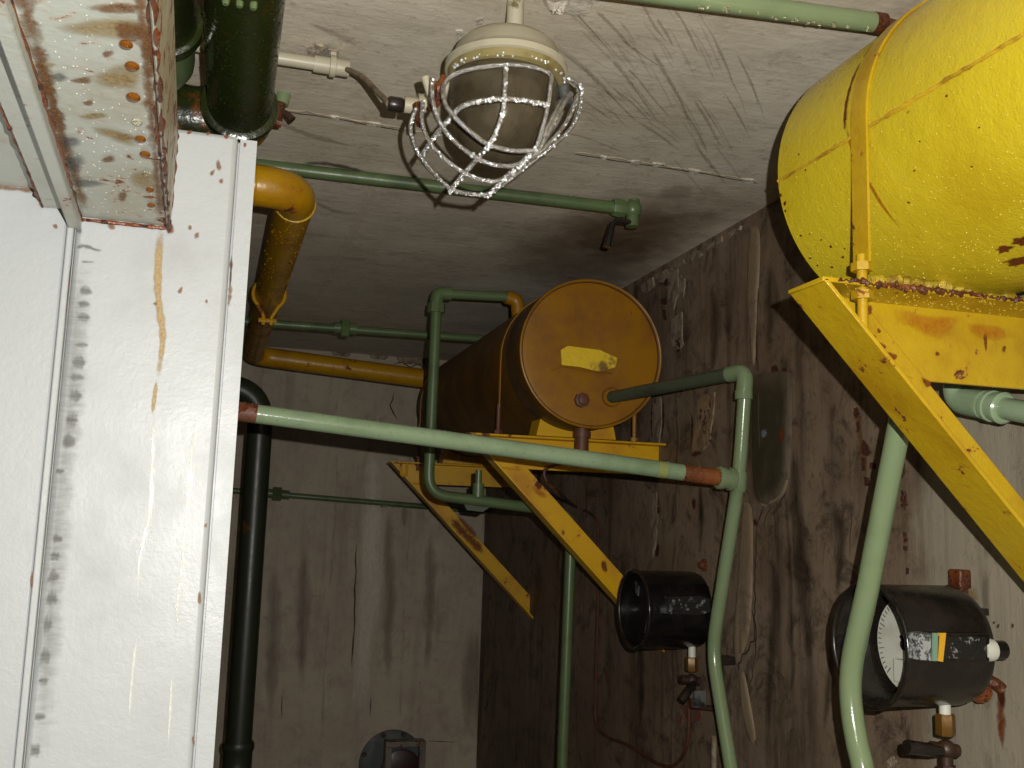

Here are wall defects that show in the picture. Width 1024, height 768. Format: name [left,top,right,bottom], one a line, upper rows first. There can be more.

corrosion [15,0,37,36]
corrosion [33,48,85,202]
corrosion [74,0,163,210]
corrosion [154,240,166,368]
flaking render [661,269,686,352]
flaking render [690,392,716,456]
crack [350,546,358,660]